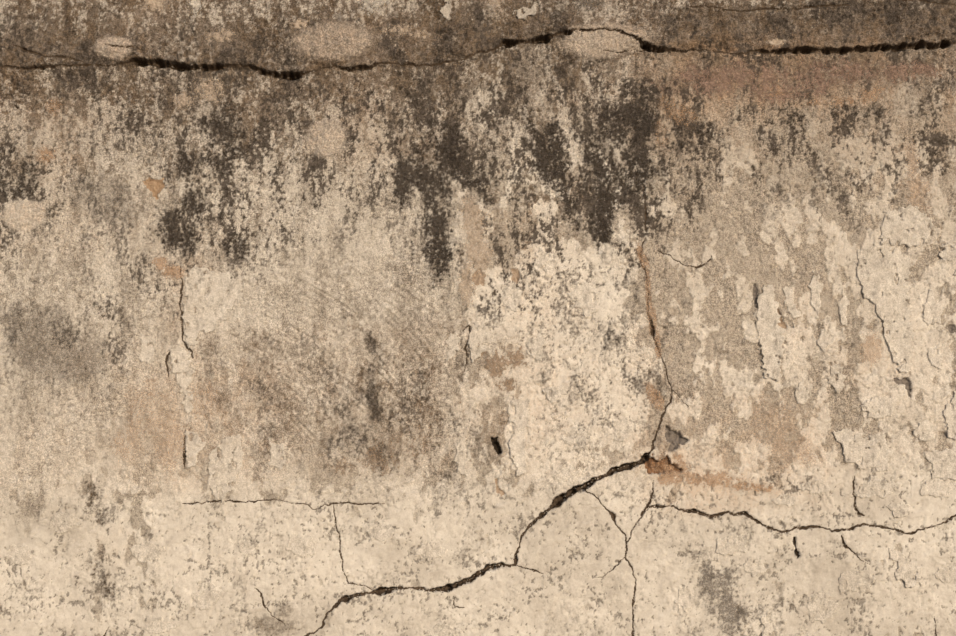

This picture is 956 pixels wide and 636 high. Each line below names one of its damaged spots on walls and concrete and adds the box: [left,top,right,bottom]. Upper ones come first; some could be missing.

crack [0,27,956,81]
damp [143,188,207,261]
damp [174,80,251,176]
damp [391,120,497,286]
damp [523,81,720,243]
crack [165,266,194,377]
peeling [753,283,801,381]
peeling [856,205,956,419]
crack [180,430,188,468]
crack [182,183,956,636]
spalling [644,425,688,474]
peeling [833,429,895,471]